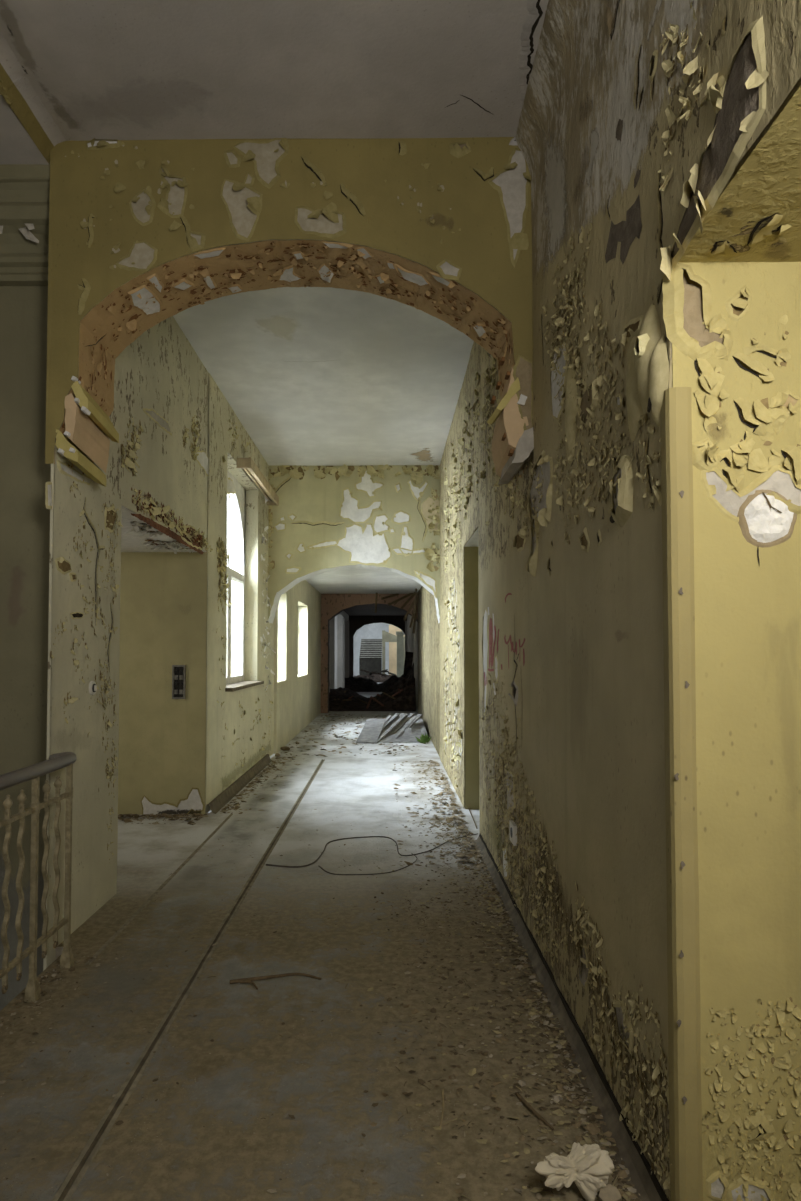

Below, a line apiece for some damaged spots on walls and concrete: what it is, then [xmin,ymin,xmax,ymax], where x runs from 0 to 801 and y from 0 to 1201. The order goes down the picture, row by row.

flaking render [649,8,801,522]